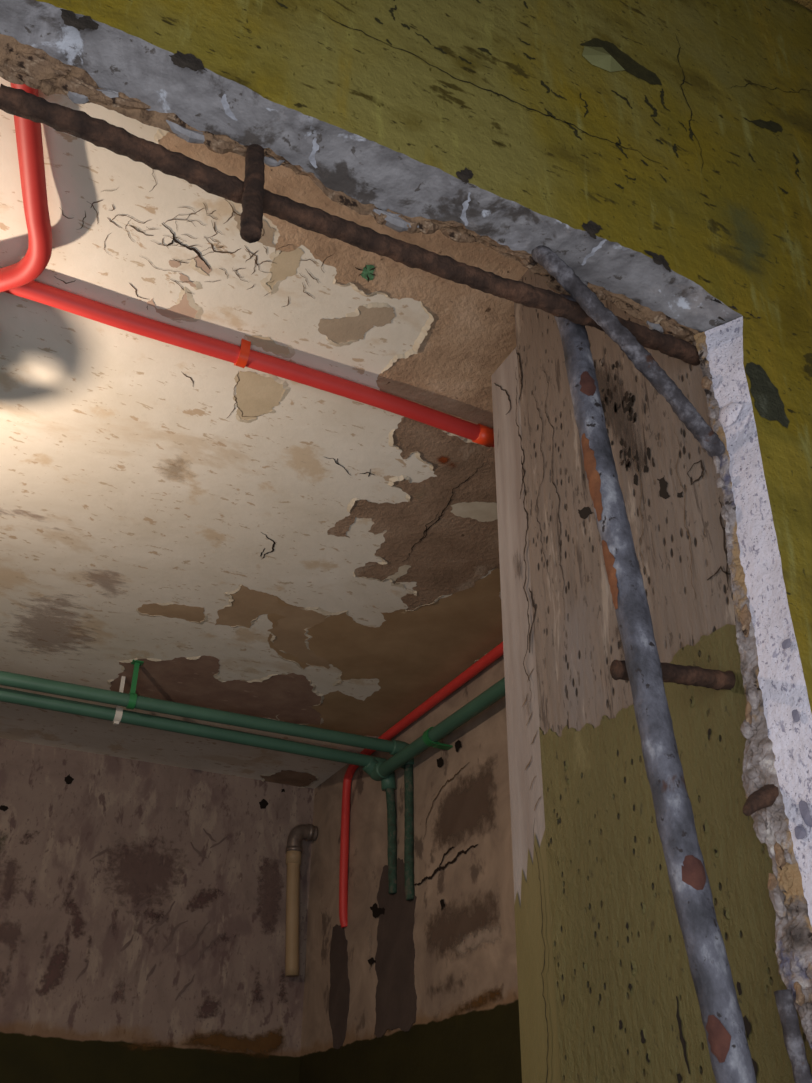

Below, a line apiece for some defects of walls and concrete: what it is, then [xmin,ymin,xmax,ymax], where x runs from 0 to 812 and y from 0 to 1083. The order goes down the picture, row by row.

spalling [0,34,248,181]
crack [316,9,661,164]
crack [59,190,332,307]
flaking render [257,213,516,429]
peeling [107,417,503,736]
flaking render [581,280,812,1049]
damp [36,893,91,995]
damp [108,845,184,919]
crack [414,765,478,886]
crack [533,821,548,1083]
corrosion [682,855,706,890]
corrosion [705,1015,731,1063]